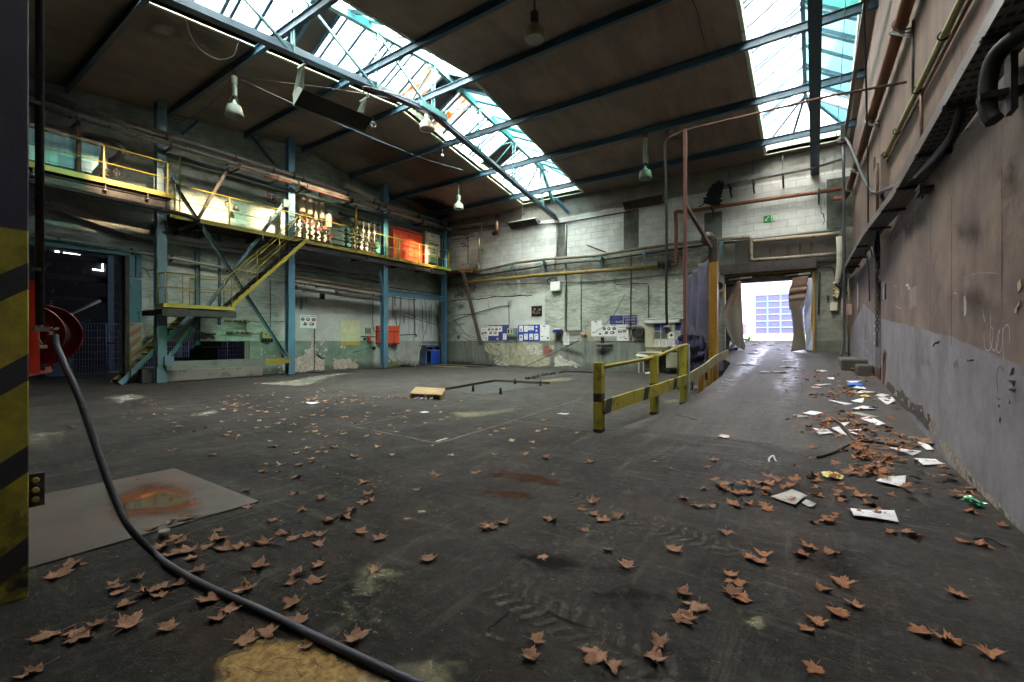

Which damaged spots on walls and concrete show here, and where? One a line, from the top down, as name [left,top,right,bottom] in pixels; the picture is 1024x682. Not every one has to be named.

flaking render [260,319,360,373]
flaking render [484,342,580,368]